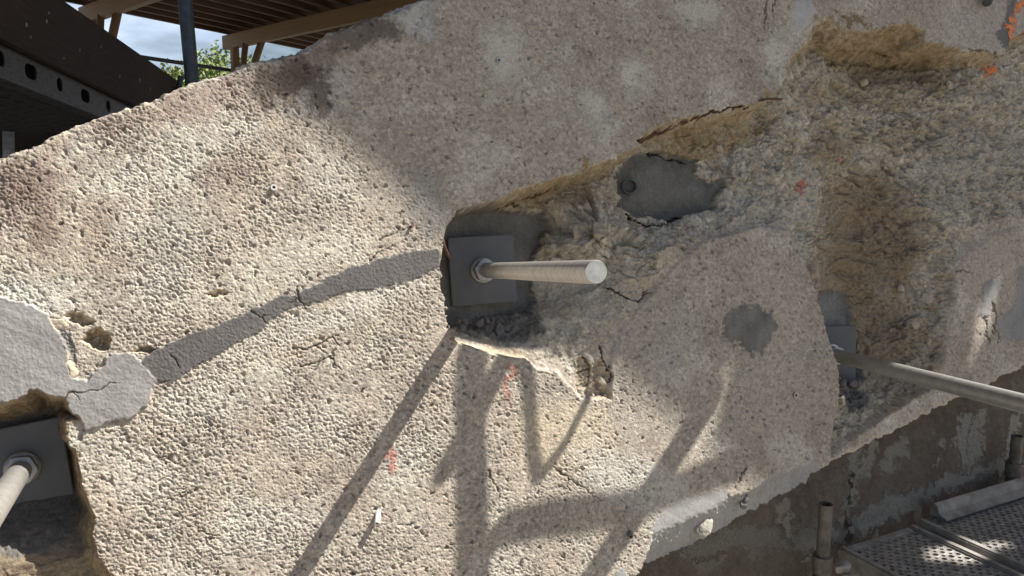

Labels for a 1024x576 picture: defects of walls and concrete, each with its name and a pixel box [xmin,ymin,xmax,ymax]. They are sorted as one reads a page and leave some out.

crack [636,105,749,164]
spalling [445,13,1024,403]
spalling [64,310,112,352]
spalling [129,345,156,354]
crack [292,336,340,370]
spalling [829,370,932,460]
spalling [0,390,113,576]